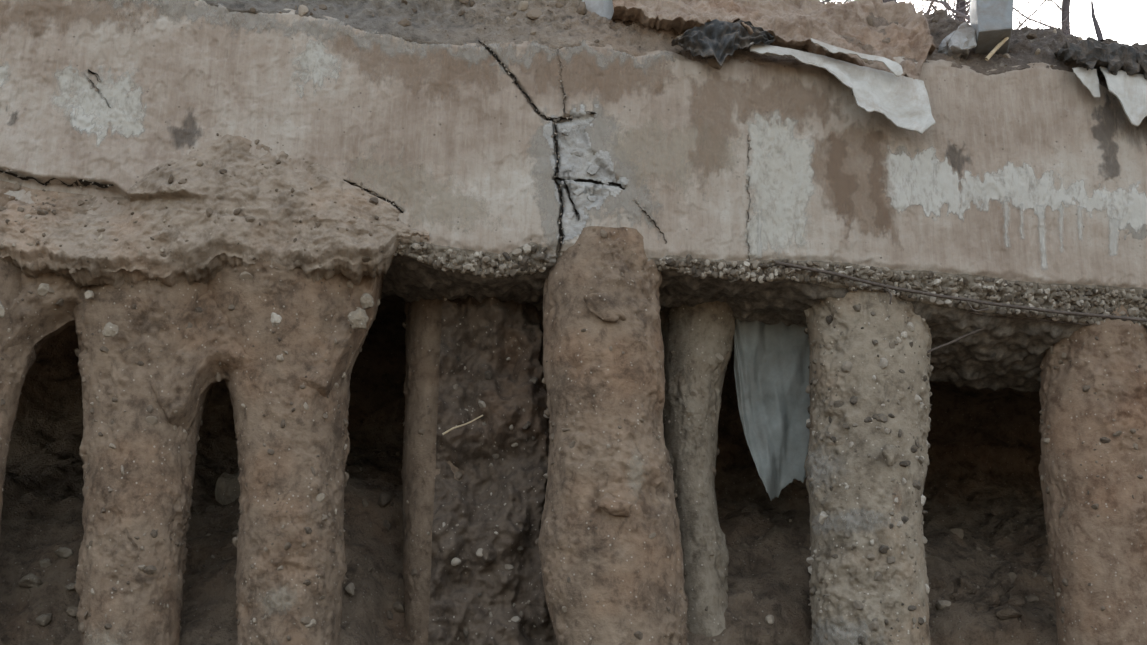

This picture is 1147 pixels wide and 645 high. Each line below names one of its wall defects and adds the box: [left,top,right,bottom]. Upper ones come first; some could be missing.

crack [0,169,113,189]
crack [84,69,110,108]
crack [343,179,403,213]
spalling [393,240,550,279]
damp [530,113,564,250]
crack [479,41,667,253]
spalling [543,104,629,245]
damp [574,98,661,226]
crack [744,135,752,262]
peeling [750,38,936,135]
damp [746,98,1147,269]
peeling [1072,66,1147,127]